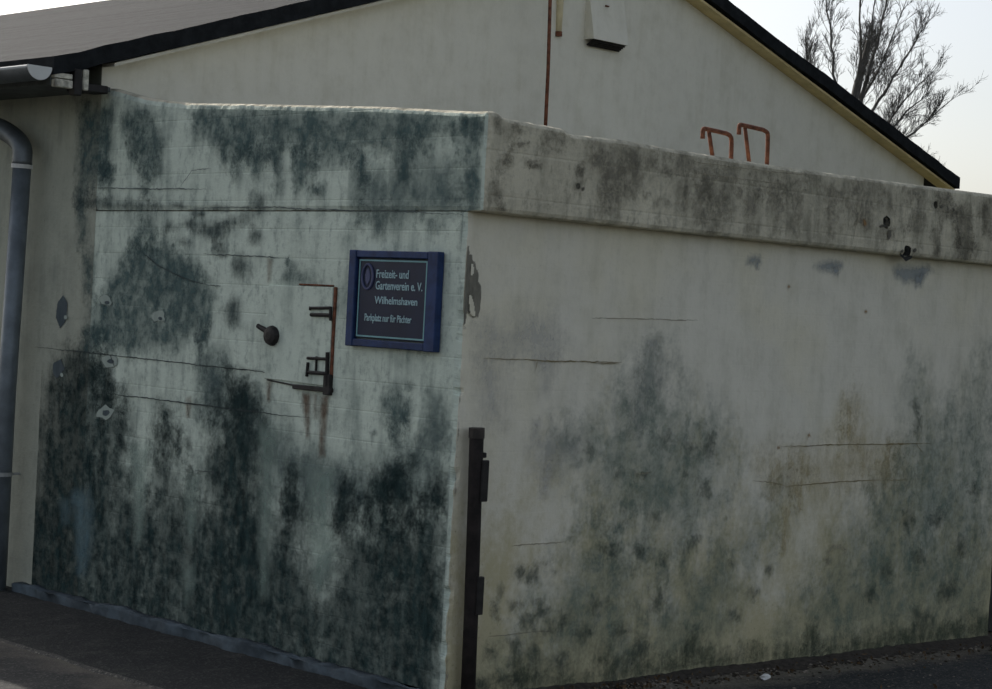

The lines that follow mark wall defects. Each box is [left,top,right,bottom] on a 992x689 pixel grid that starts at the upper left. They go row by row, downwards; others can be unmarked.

damp [76,101,161,245]
damp [193,107,480,233]
damp [186,211,236,252]
damp [228,301,238,324]
peeling [463,246,481,326]
damp [78,331,111,400]
rust [303,395,327,453]
damp [205,368,443,526]